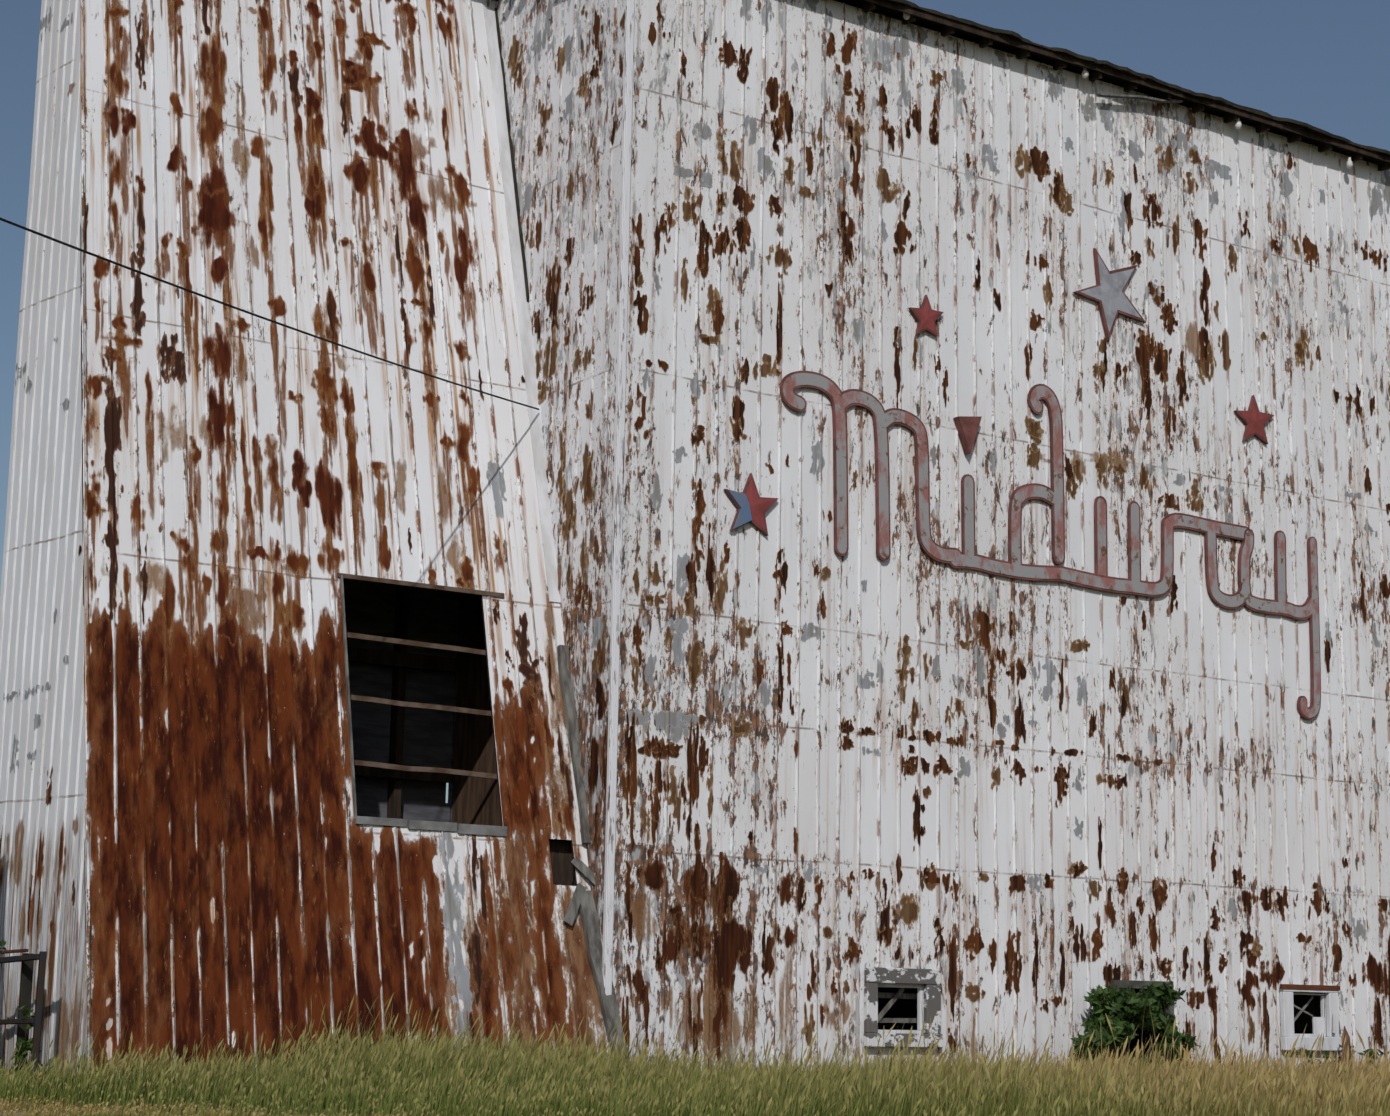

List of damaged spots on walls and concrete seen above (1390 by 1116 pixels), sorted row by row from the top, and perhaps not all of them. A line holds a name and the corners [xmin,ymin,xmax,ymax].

peeling [849,459,874,492]
peeling [1345,467,1390,537]
corrosion [27,0,504,1089]
peeling [1170,575,1178,613]
peeling [1324,619,1333,673]
peeling [1360,571,1390,647]
peeling [542,425,863,1063]
peeling [838,717,881,756]
corrosion [467,612,607,1073]
peeling [849,608,1330,1070]
peeling [1332,897,1390,1050]